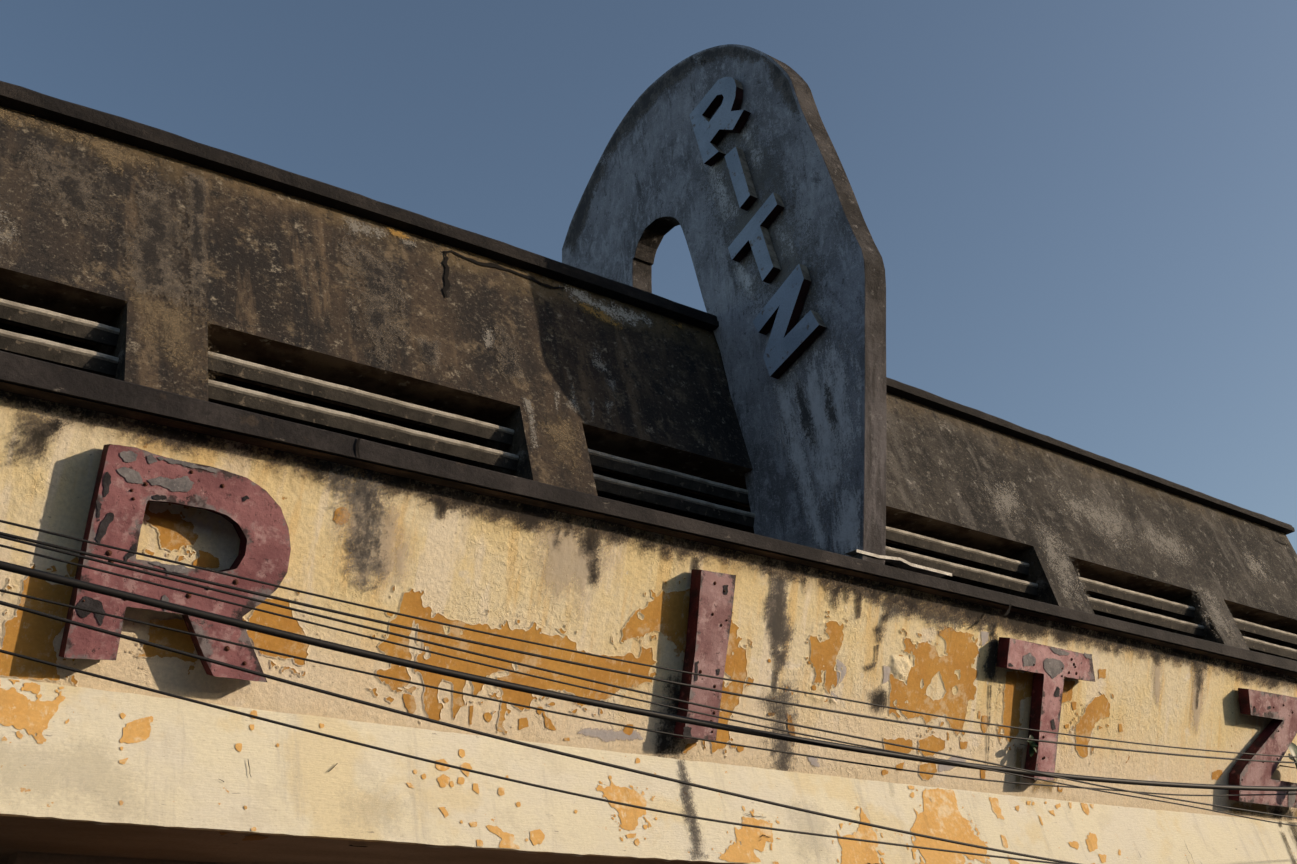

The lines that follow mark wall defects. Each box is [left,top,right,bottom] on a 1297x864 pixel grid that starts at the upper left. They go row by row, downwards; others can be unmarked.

water stain [563,46,800,253]
crack [442,250,565,298]
water stain [767,331,862,557]
peeling [0,557,106,744]
peeling [368,577,699,741]
peeling [596,775,657,846]
water stain [578,676,708,859]
water stain [0,390,1297,761]
peeling [712,806,780,864]
peeling [832,806,886,864]
peeling [882,622,1123,864]
water stain [1231,802,1297,864]